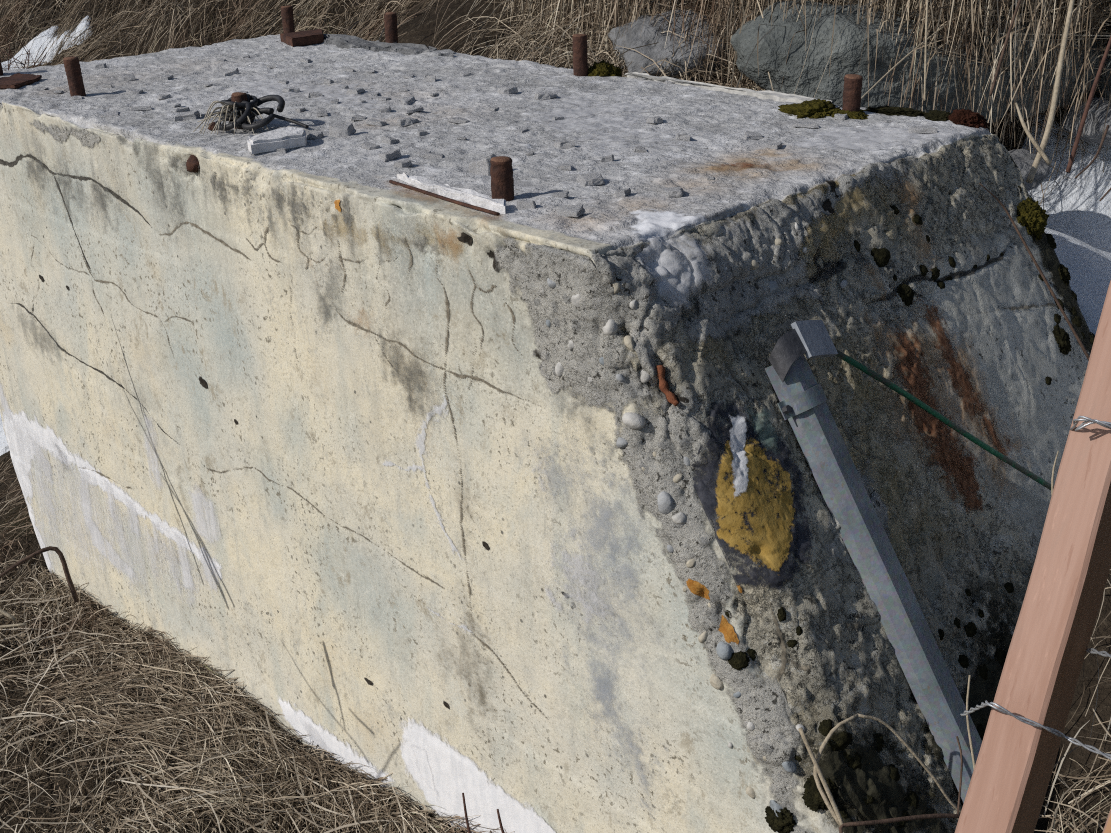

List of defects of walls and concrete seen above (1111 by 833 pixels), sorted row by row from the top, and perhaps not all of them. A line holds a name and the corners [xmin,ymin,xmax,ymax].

crack [0,154,550,723]
spalling [494,154,917,833]
spalling [744,131,783,150]
corrosion [889,305,1011,513]